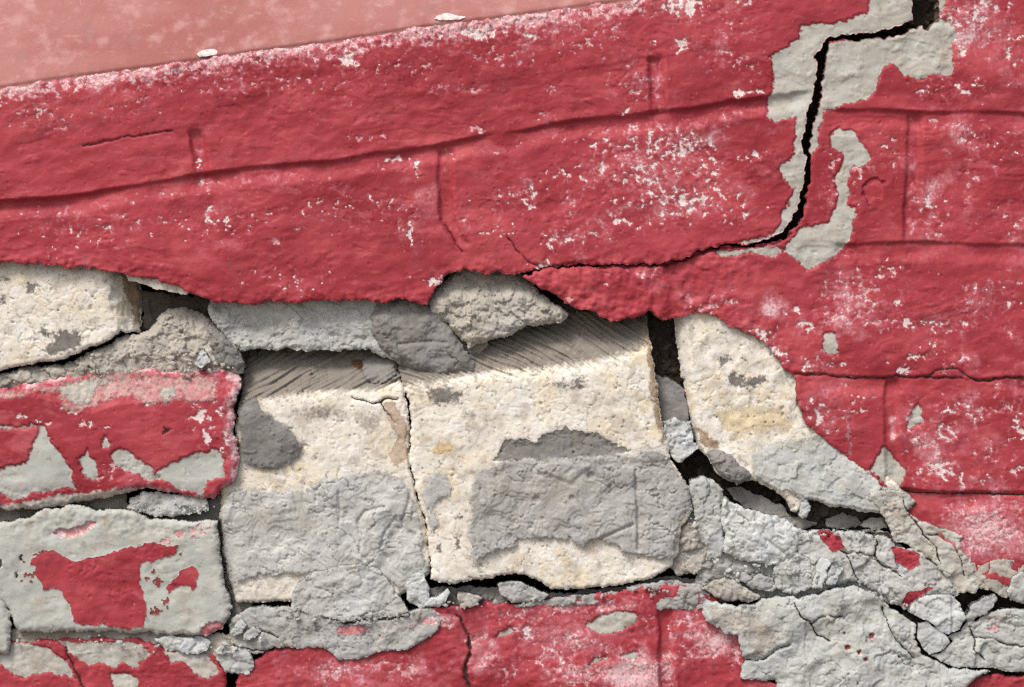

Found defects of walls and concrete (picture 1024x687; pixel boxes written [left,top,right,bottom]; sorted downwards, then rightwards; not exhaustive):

peeling [492,65,748,269]
crack [508,0,935,269]
peeling [715,0,1024,269]
crack [647,311,685,396]
peeling [0,372,229,511]
spalling [493,426,631,463]
crack [669,439,786,508]
peeling [0,521,218,687]
spalling [405,572,483,629]
crack [794,603,843,642]
crack [828,532,902,580]
crack [881,488,1024,675]